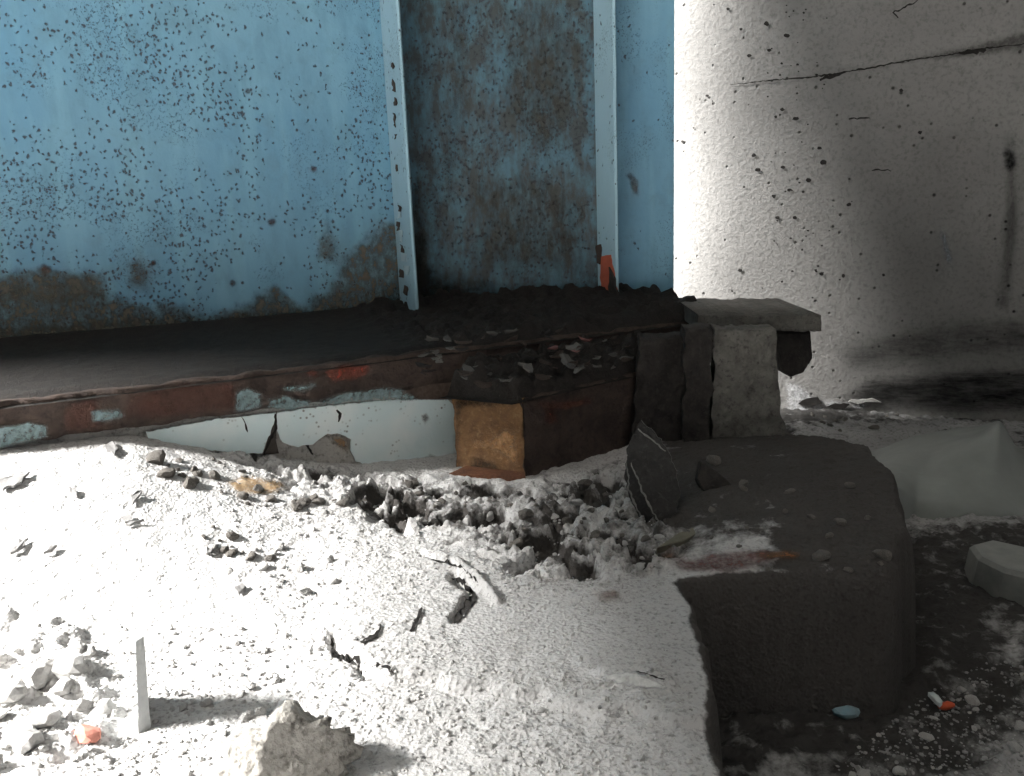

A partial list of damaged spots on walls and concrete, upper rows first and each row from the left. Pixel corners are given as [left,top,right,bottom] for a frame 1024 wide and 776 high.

crack [892,0,918,18]
crack [730,43,1024,85]
leakage [1005,152,1015,169]
rust [415,205,478,297]
rust [0,224,400,338]
rust [400,382,493,419]
crack [242,411,279,455]
rust [471,431,516,468]